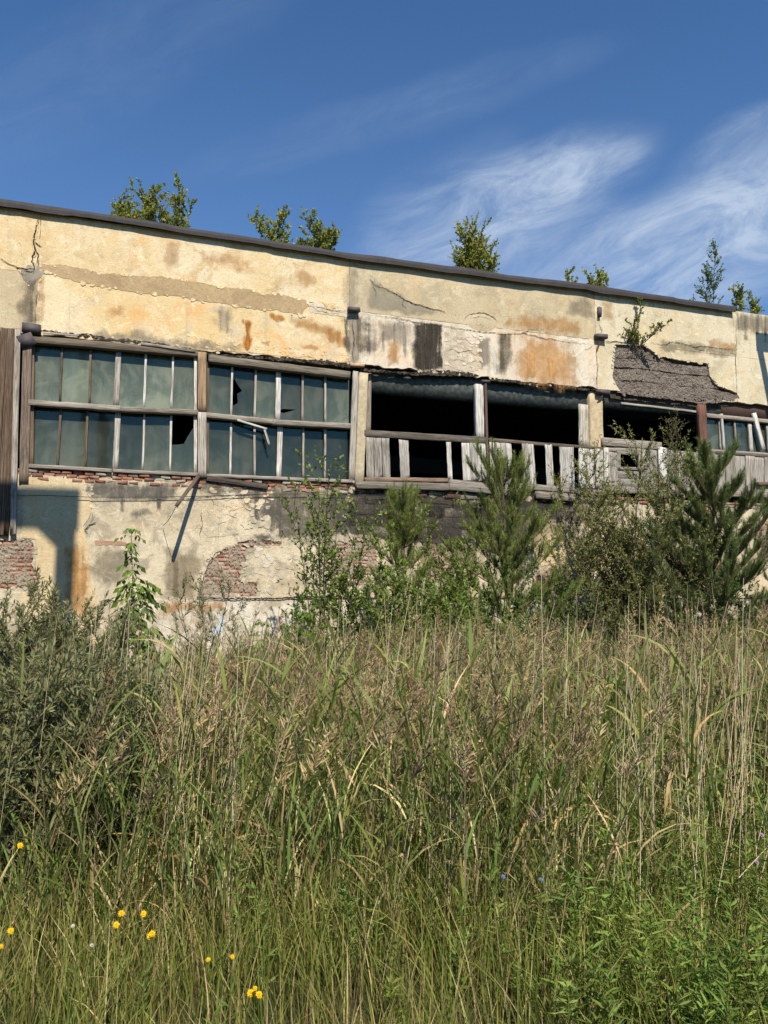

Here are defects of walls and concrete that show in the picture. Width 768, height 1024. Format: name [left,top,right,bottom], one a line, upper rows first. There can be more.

crack [1,219,40,274]
peeling [20,263,350,318]
rust [243,320,252,349]
water stain [369,282,443,371]
water stain [479,335,510,374]
crack [314,279,737,379]
rust [507,317,579,386]
spalling [610,345,742,407]
spalling [0,536,42,591]
spalling [193,483,601,645]